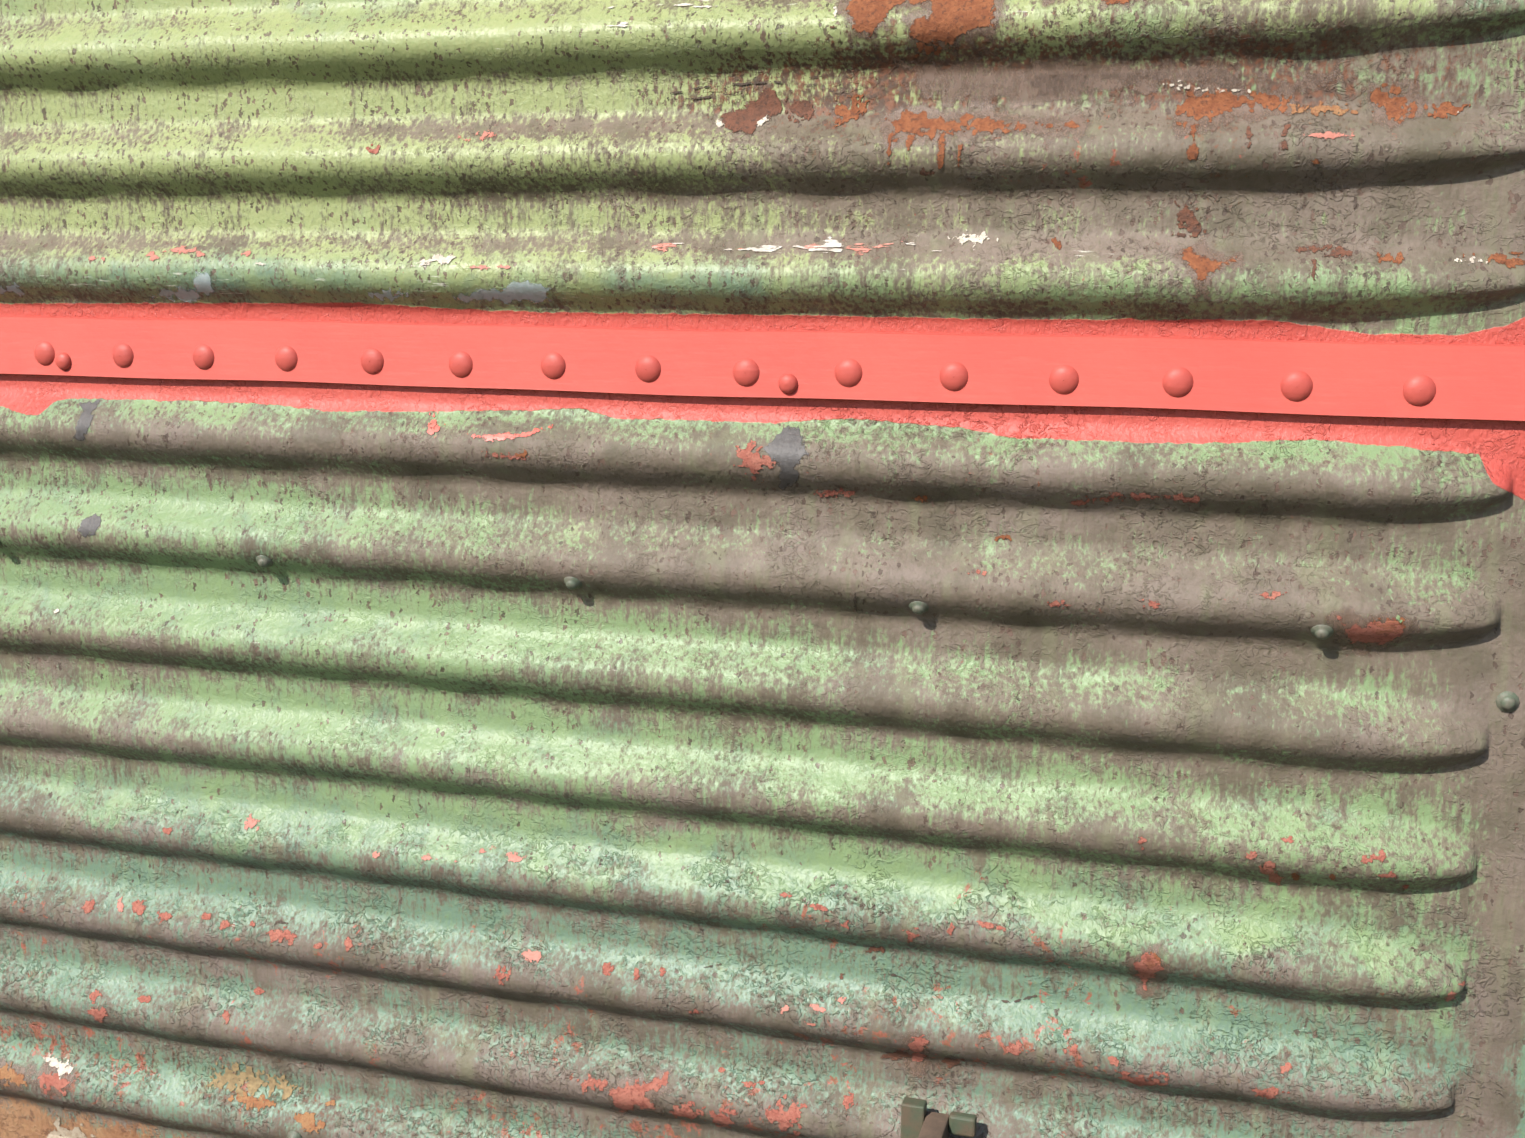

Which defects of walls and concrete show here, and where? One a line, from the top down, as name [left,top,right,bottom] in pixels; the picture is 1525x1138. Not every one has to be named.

rust [1101,0,1139,9]
rust [830,0,1005,58]
rust [1163,78,1471,161]
rust [879,103,1089,176]
peeling [244,813,260,831]
peeling [117,896,172,921]
peeling [202,912,230,930]
peeling [249,920,297,946]
peeling [87,989,108,1023]
peeling [804,997,846,1026]
rust [0,1052,74,1097]
peeling [47,1116,94,1138]